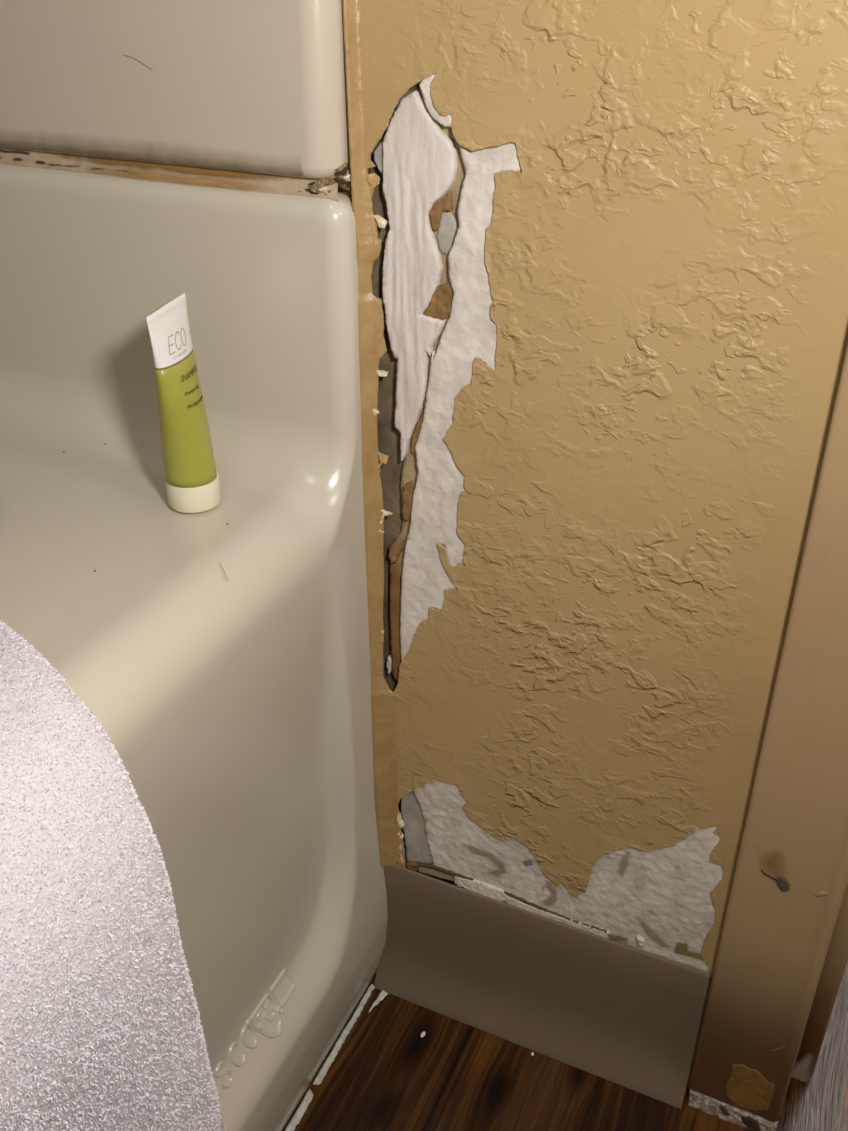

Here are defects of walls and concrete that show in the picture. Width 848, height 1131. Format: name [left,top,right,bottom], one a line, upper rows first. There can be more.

flaking render [365,73,522,691]
flaking render [397,780,723,979]